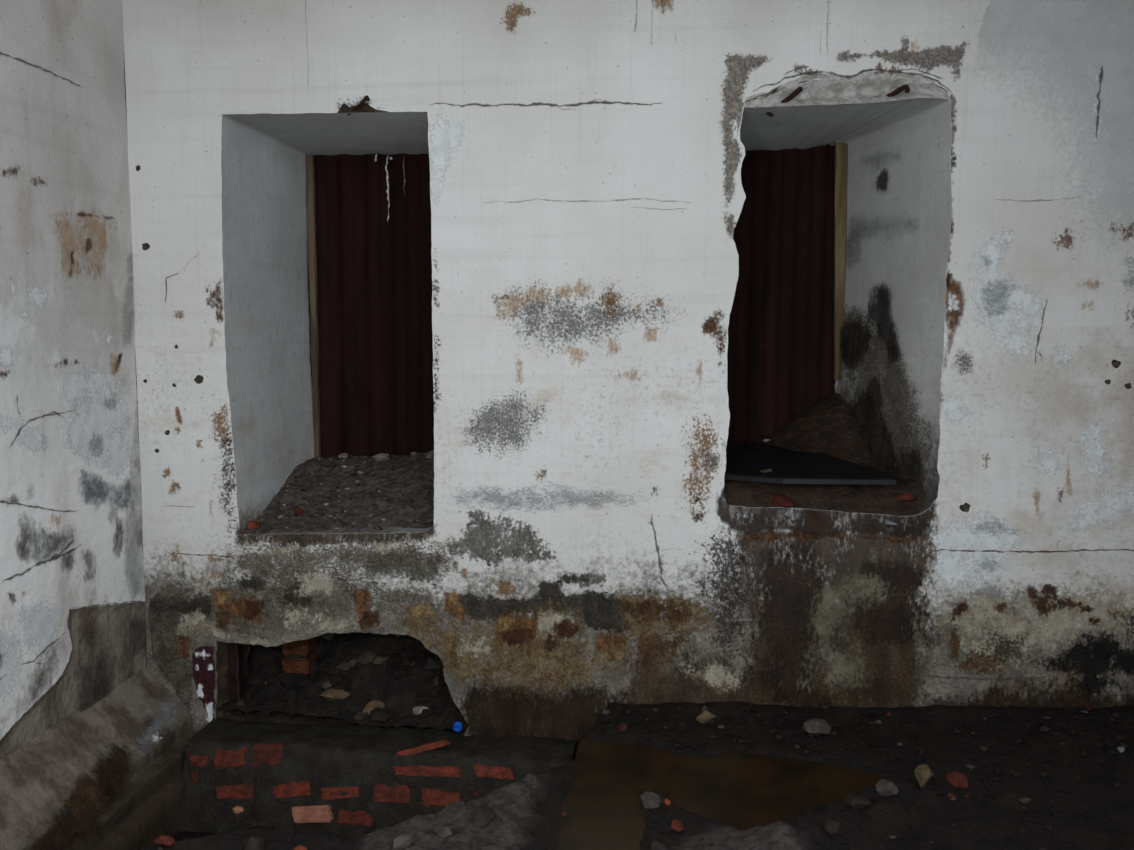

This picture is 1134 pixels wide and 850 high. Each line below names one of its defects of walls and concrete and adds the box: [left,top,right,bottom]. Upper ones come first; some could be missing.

rust [501,2,535,31]
crack [0,52,82,87]
crack [431,99,659,109]
peeling [1090,66,1103,142]
spalling [721,39,967,236]
rust [58,212,113,275]
rust [596,292,622,320]
water stain [837,284,932,483]
water stain [465,391,545,452]
rust [682,416,725,522]
crack [931,541,1134,553]
water stain [160,425,1134,746]